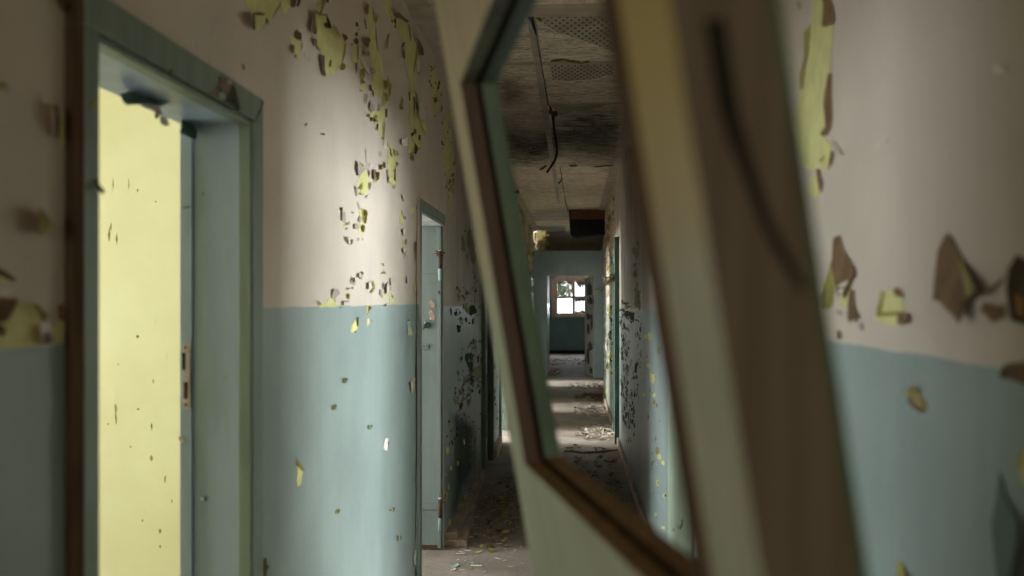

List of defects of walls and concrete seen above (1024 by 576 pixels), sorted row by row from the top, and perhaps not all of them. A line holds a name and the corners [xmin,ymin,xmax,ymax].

peeling [244,0,301,31]
peeling [288,0,456,259]
peeling [797,0,843,198]
peeling [0,269,65,348]
peeling [317,264,396,333]
peeling [585,196,660,443]
peeling [825,235,907,339]
peeling [932,233,1024,324]
peeling [296,457,305,486]
peeling [444,339,504,526]